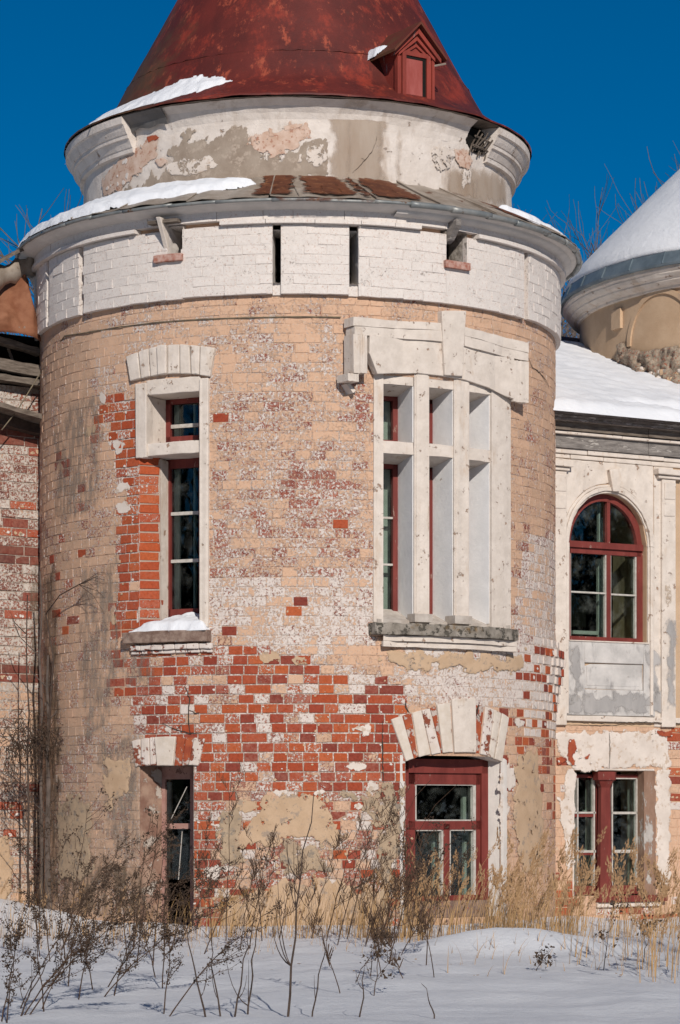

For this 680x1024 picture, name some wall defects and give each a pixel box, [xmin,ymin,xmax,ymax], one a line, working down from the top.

flaking render [101,121,329,196]
corrosion [251,175,420,202]
spalling [432,128,493,188]
peeling [83,392,414,927]
flaking render [378,649,524,675]
flaking render [497,708,680,920]